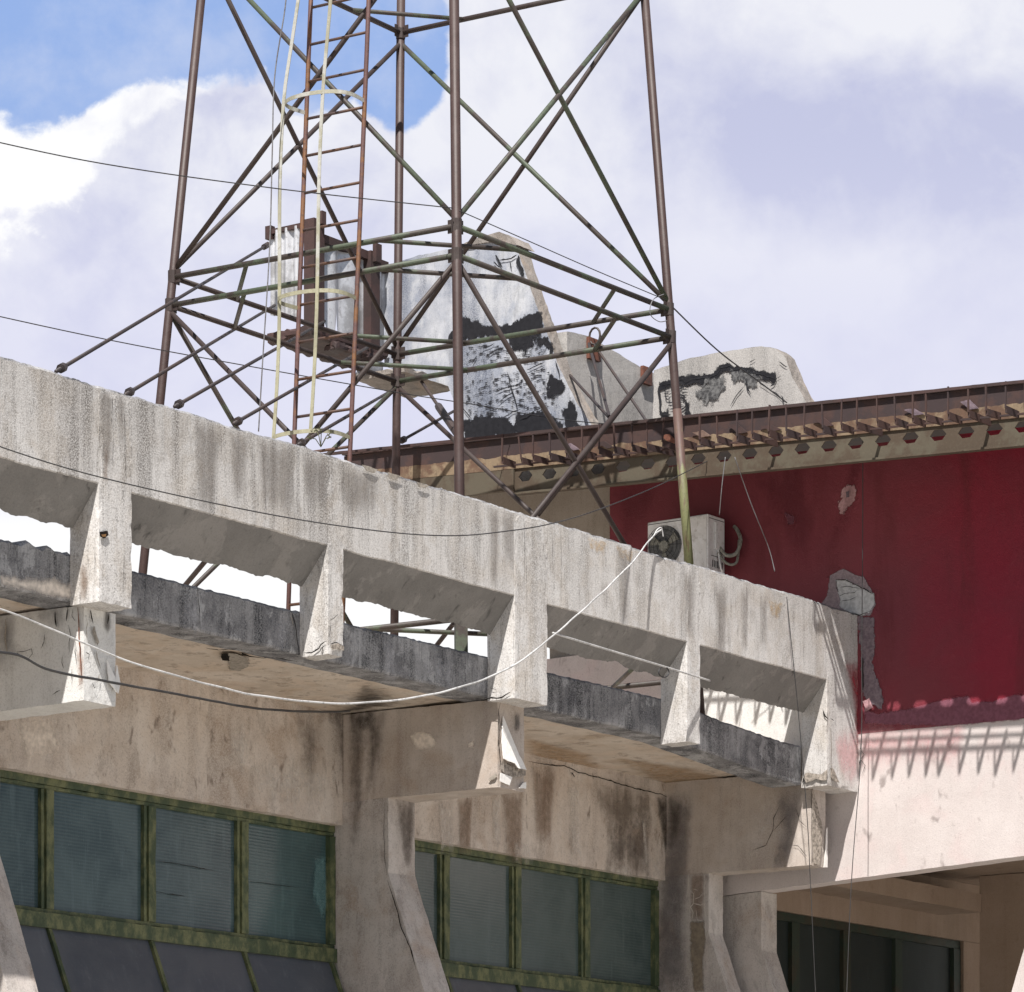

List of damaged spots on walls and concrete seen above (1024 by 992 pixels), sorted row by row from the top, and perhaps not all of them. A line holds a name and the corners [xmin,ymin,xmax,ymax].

peeling [838,485,856,514]
peeling [822,569,1024,726]
water stain [349,689,382,720]
flaking render [488,716,527,789]
crack [528,761,666,797]
crack [384,842,416,968]